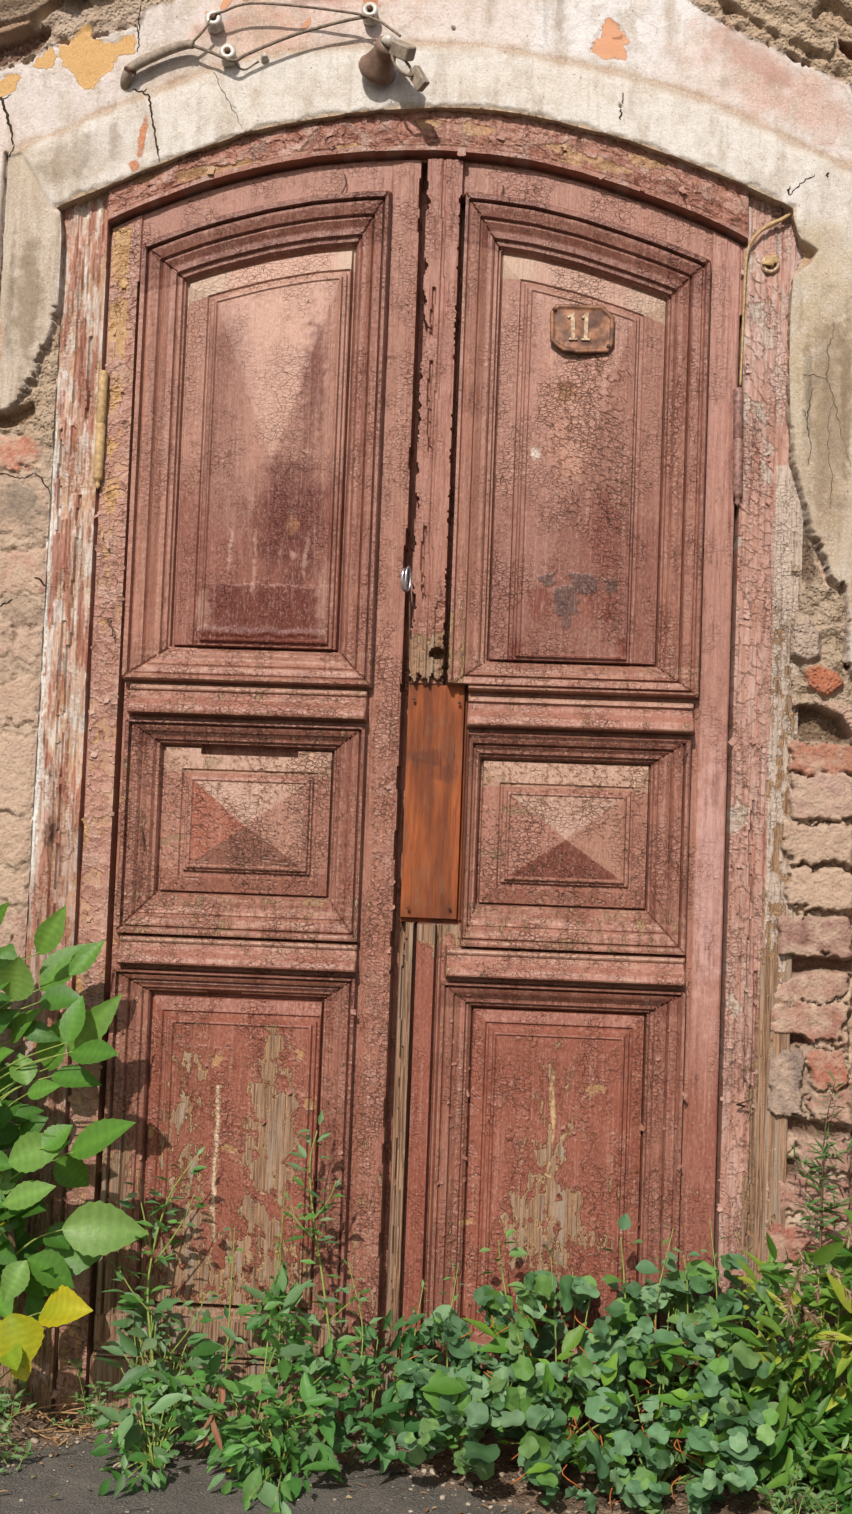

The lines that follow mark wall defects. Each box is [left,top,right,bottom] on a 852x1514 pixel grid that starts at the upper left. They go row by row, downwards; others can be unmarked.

spalling [0,0,175,97]
crack [133,5,141,51]
peeling [590,18,629,60]
crack [133,88,159,157]
flaking render [788,528,852,745]
peeling [62,1139,162,1207]
peeling [491,1170,563,1262]